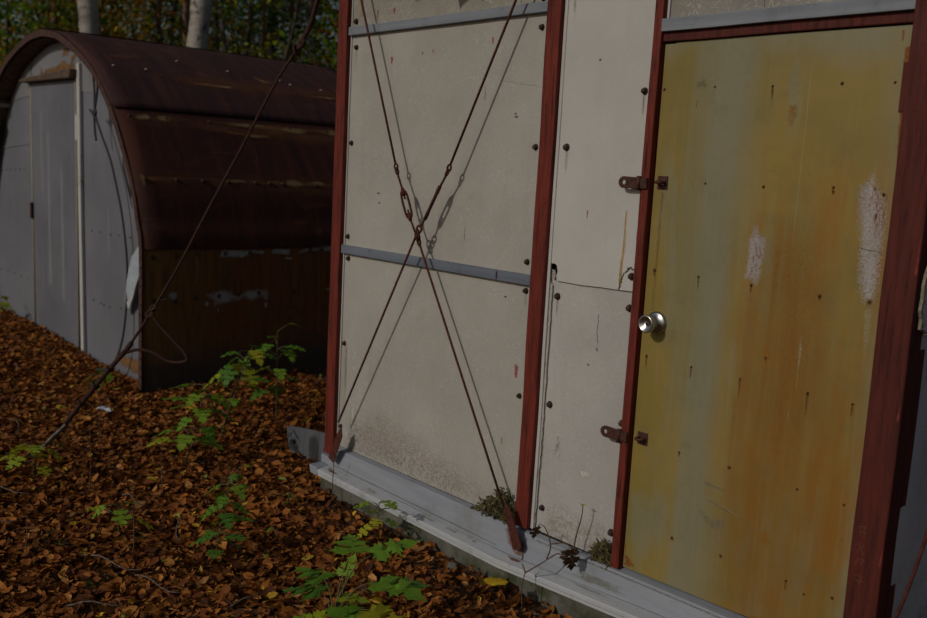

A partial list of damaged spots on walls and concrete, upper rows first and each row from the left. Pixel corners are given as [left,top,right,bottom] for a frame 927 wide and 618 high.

rust [618,212,627,286]
peeling [744,226,767,286]
peeling [855,174,890,365]